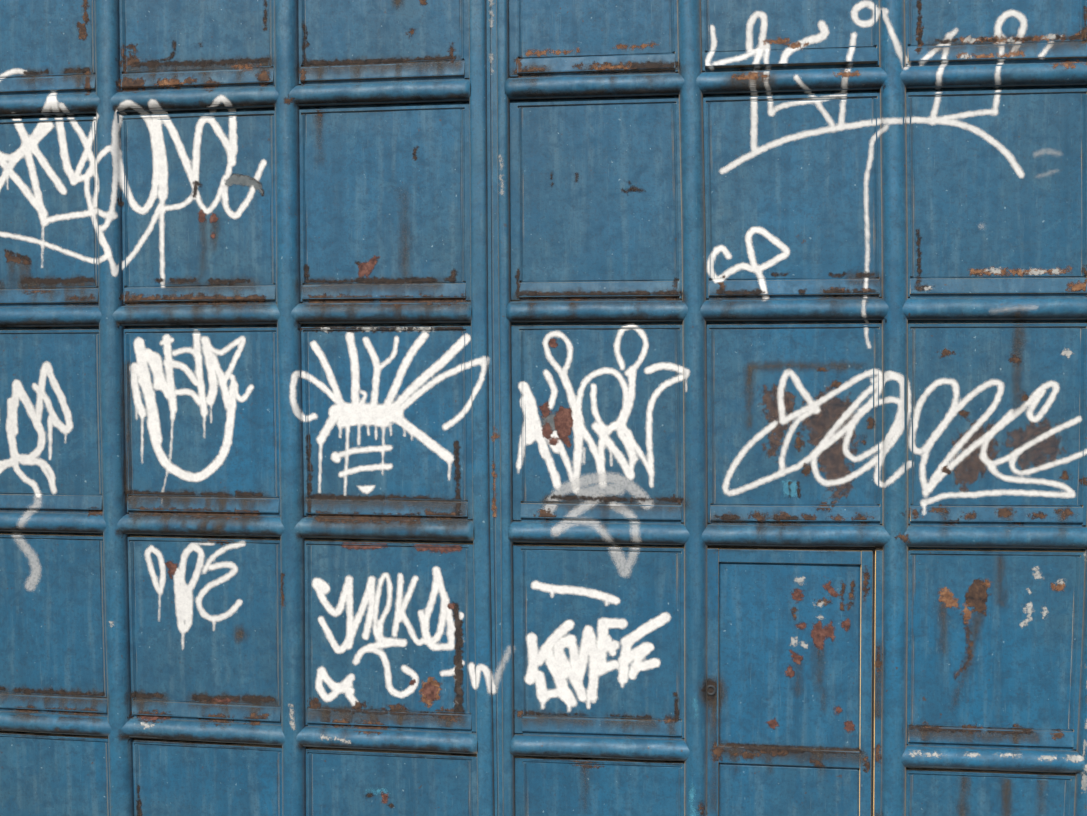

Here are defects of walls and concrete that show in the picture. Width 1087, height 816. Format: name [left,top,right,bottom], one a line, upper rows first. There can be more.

rust [116,55,272,93]
rust [300,42,459,85]
rust [514,43,680,78]
rust [20,276,97,305]
rust [304,264,467,309]
rust [915,229,931,291]
rust [970,265,1087,292]
peeling [1019,566,1065,627]
rust [307,603,464,744]
rust [0,687,105,719]
rust [127,691,171,730]
rust [192,694,276,726]